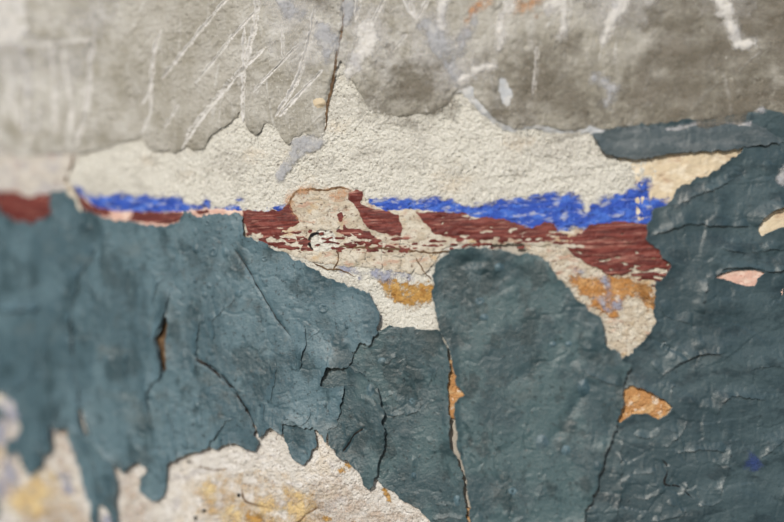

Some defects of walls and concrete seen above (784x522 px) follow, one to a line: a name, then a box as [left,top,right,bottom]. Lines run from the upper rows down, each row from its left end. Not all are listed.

crack [324,0,344,132]
spalling [49,61,784,246]
spalling [715,270,765,286]
crack [195,356,251,417]
spalling [0,226,673,522]